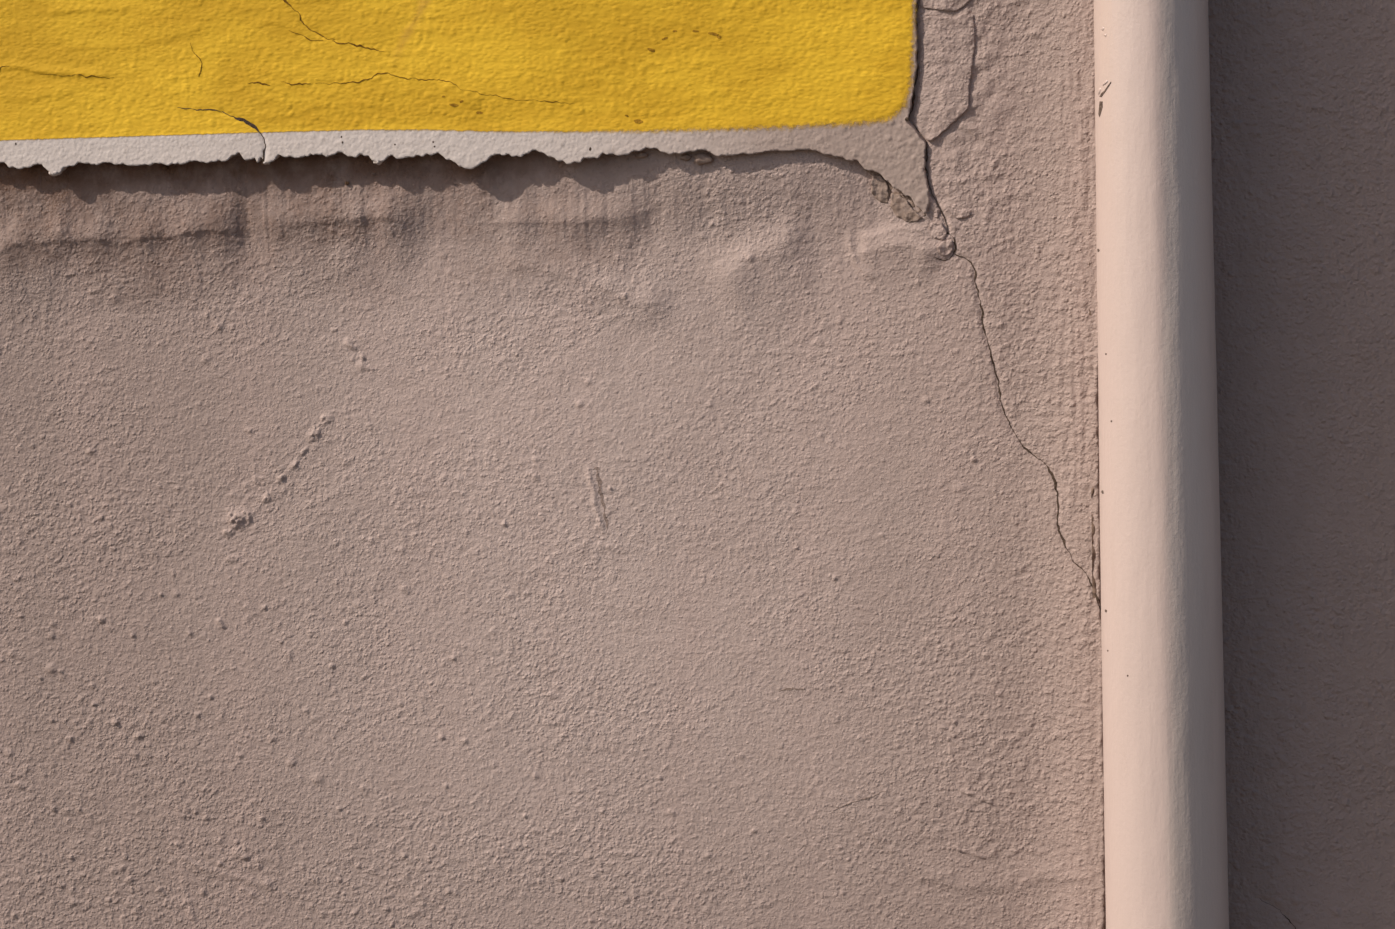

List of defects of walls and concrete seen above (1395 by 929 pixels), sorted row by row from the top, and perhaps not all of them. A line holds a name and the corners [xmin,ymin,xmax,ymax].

crack [248,0,572,104]
crack [178,107,266,164]
flaking render [680,153,714,165]
crack [909,3,1101,611]